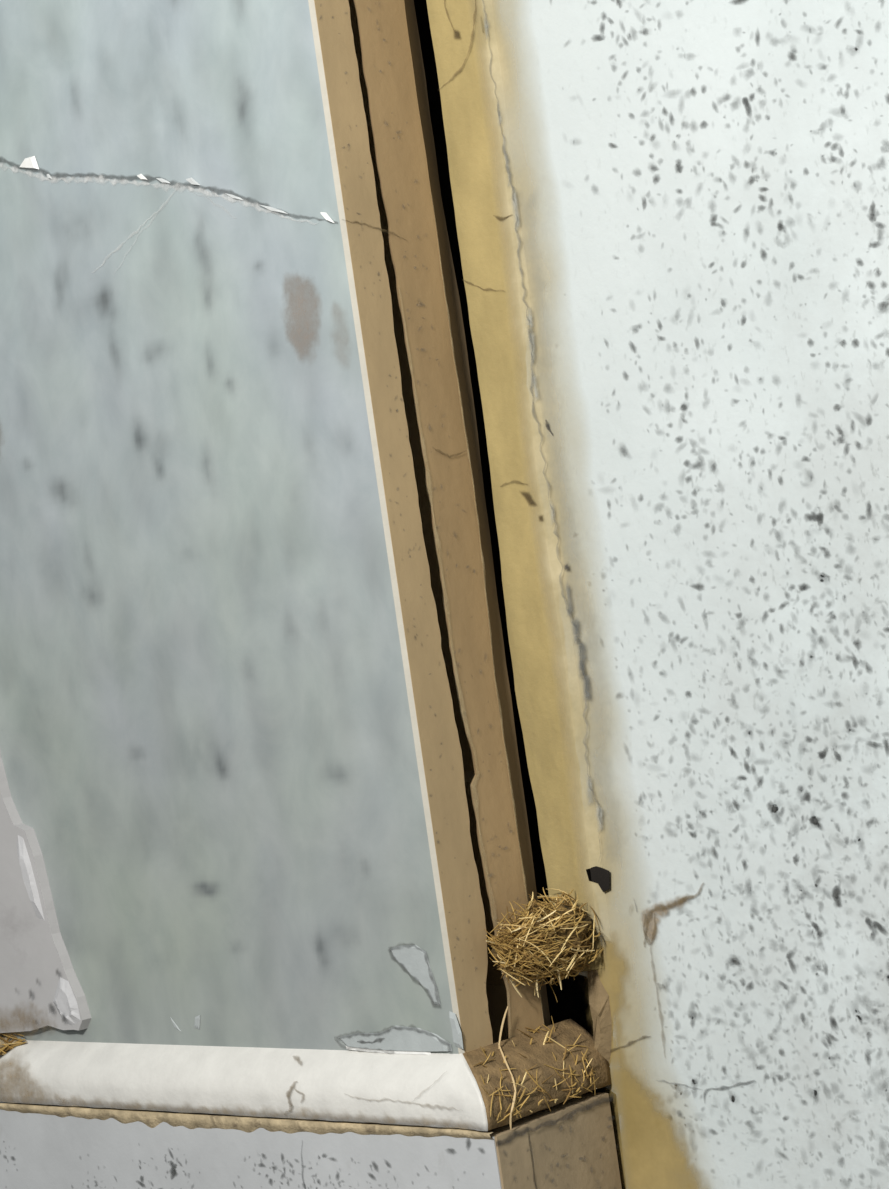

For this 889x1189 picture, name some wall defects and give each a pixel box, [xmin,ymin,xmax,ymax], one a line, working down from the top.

crack [0,156,335,223]
peeling [17,835,45,921]
peeling [49,970,80,1026]
peeling [338,945,463,1055]